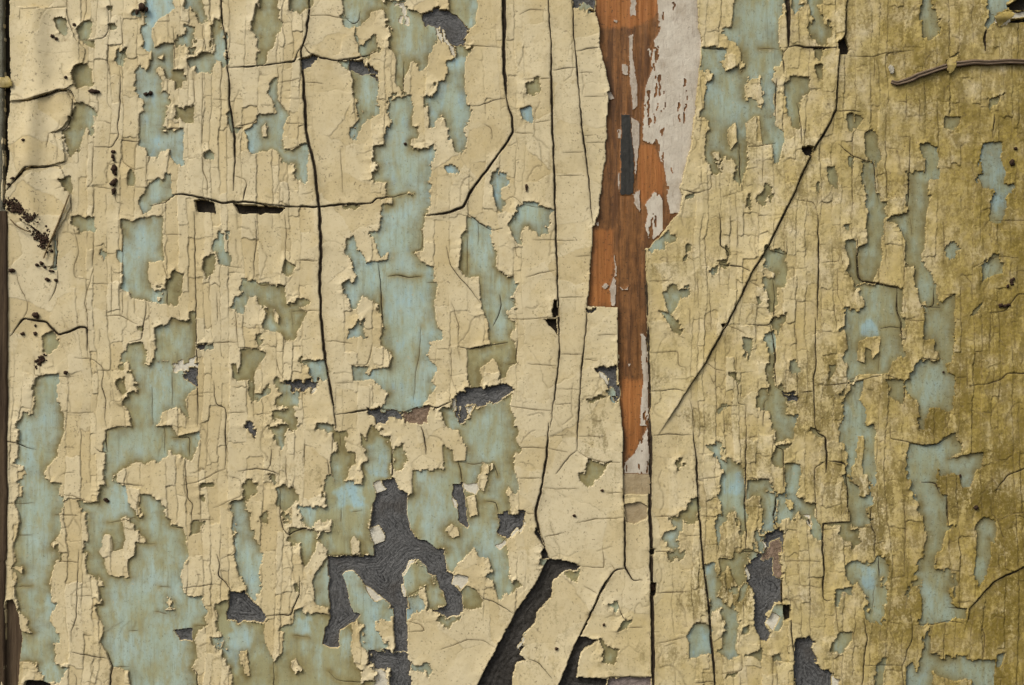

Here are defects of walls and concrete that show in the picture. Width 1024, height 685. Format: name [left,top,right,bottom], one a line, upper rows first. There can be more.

peeling [6,374,68,685]
crack [5,89,75,193]
crack [10,230,146,453]
crack [151,0,454,528]
peeling [78,0,580,685]
peeling [662,497,701,562]
peeling [573,0,848,524]
crack [420,0,1024,685]
peeling [687,113,955,685]
peeling [905,433,1004,685]
peeling [975,142,1015,224]
peeling [985,0,1024,29]